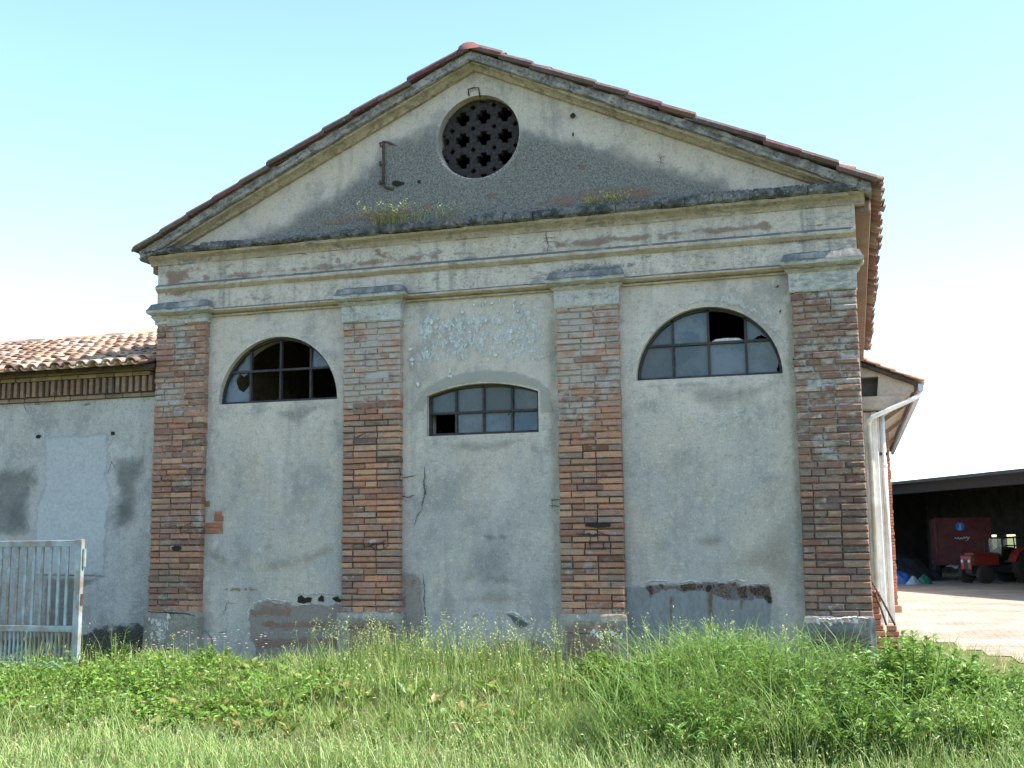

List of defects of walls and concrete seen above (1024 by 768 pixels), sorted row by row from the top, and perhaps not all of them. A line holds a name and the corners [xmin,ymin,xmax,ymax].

spalling [646,578,772,604]